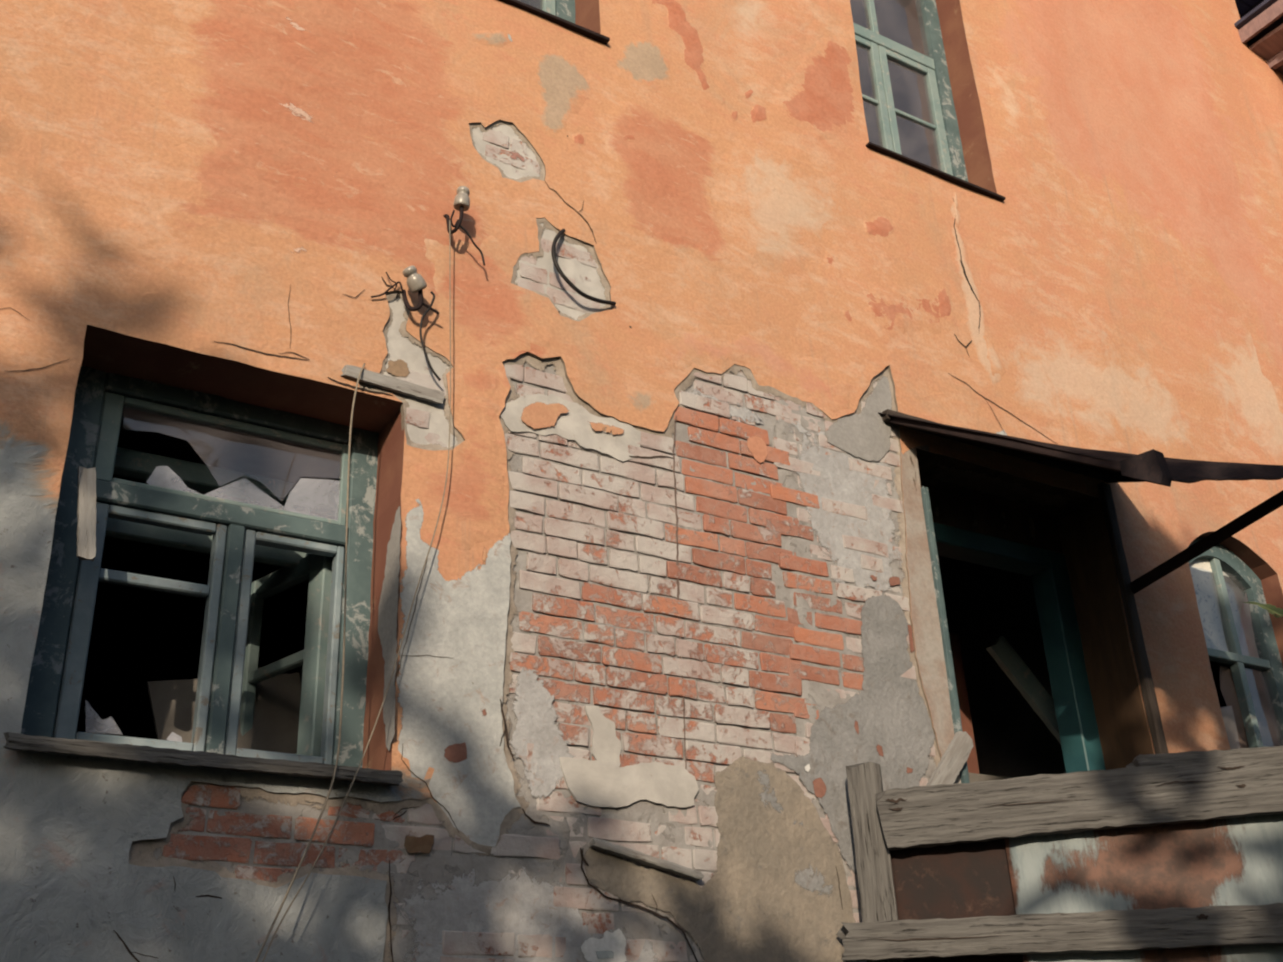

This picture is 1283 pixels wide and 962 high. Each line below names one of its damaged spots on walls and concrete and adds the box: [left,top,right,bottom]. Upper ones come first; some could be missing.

flaking render [469,49,591,182]
flaking render [616,0,710,94]
peeling [719,34,862,141]
crack [214,285,393,396]
spalling [359,292,464,451]
spalling [511,218,611,321]
crack [948,199,1056,443]
flaking render [0,353,955,962]